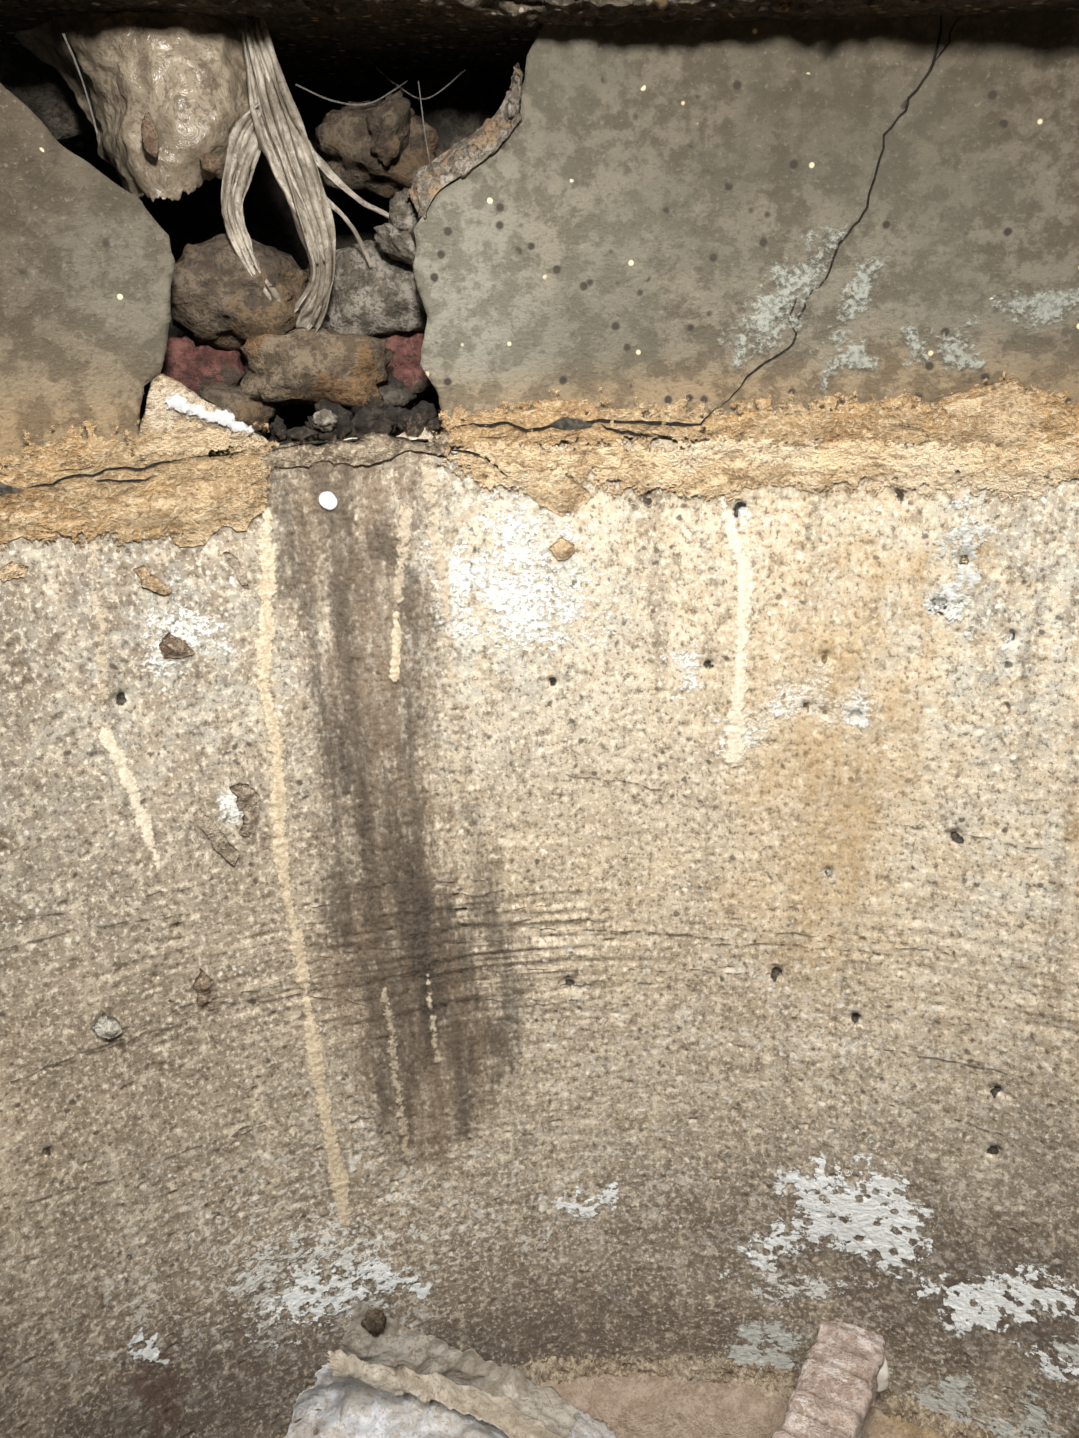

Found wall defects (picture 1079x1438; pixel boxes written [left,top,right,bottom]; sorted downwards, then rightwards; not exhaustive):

crack [450,15,961,477]
leakage [210,454,629,1356]
leakage [716,1134,1079,1382]